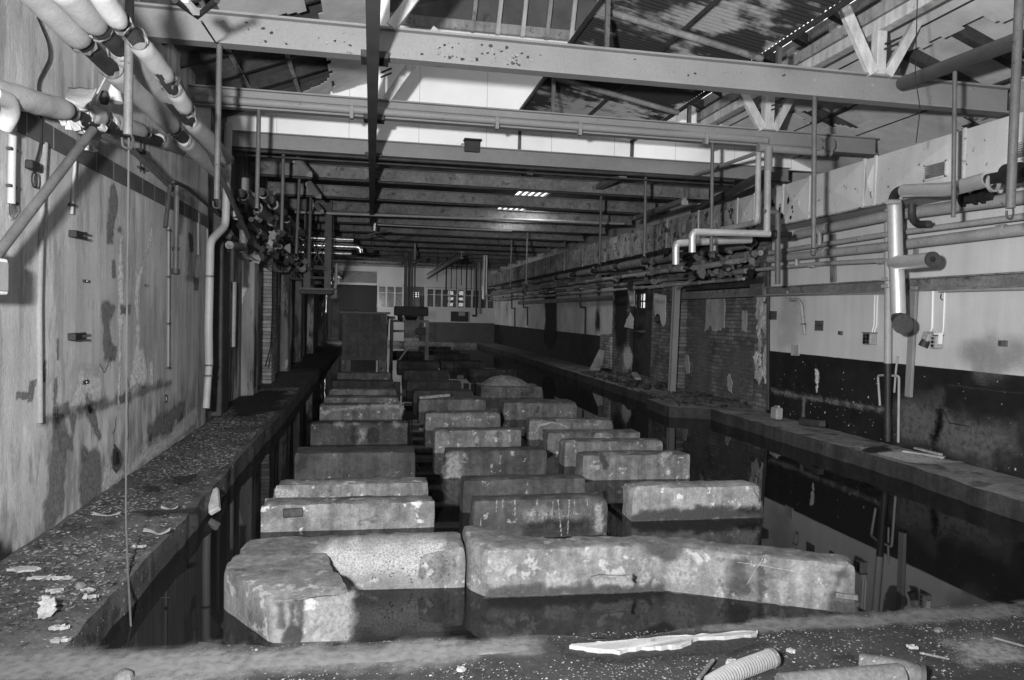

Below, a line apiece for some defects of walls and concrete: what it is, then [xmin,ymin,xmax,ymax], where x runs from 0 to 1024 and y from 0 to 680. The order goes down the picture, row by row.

damp [43,224,198,531]
peeling [753,297,766,385]